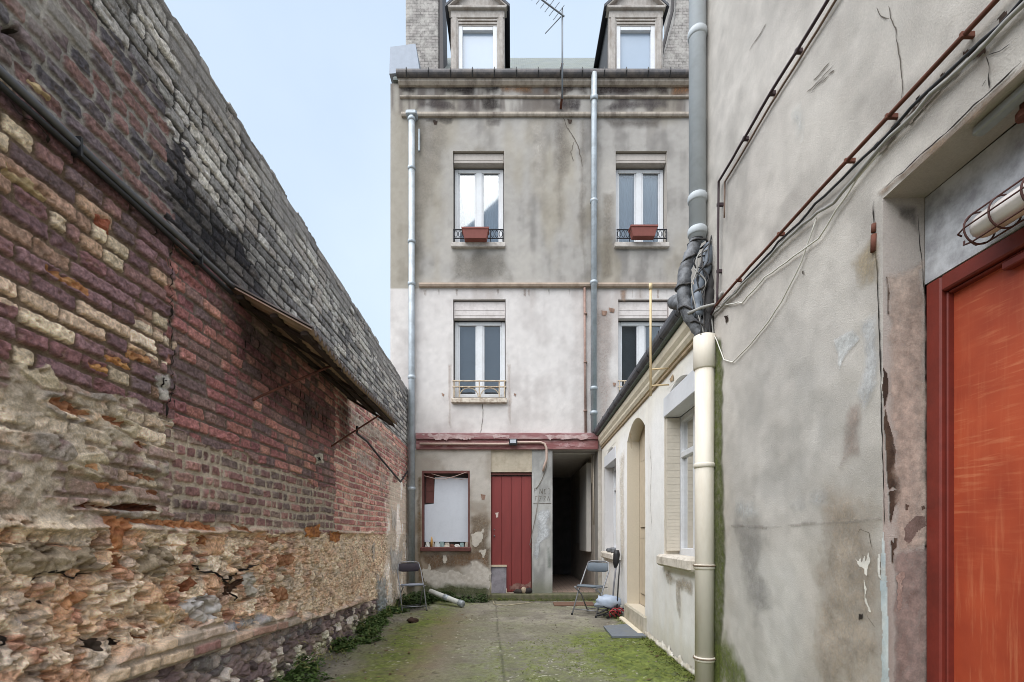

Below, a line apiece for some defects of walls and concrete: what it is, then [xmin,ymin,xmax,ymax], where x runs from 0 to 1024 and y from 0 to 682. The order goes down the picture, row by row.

crack [877,6,903,99]
crack [166,243,175,422]
spalling [88,350,151,374]
spalling [49,397,89,417]
spalling [102,415,134,428]
peeling [545,434,591,447]
peeling [856,265,927,682]
crack [192,563,259,601]